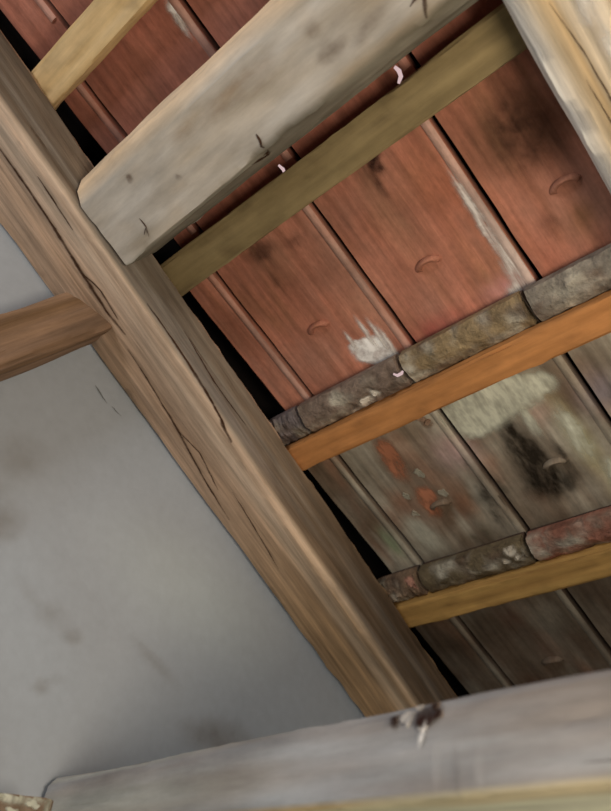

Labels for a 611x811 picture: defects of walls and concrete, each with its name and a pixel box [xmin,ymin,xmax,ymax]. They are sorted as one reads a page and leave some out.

crack [554,10,611,122]
crack [0,149,276,564]
damp [346,321,398,364]
damp [442,372,555,438]
damp [562,414,591,453]
peeling [0,793,49,811]